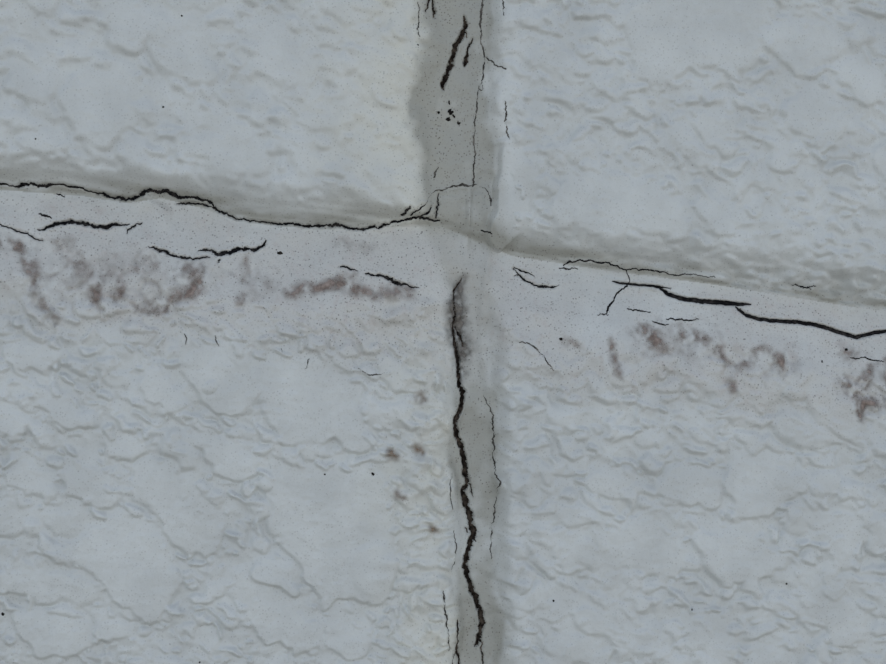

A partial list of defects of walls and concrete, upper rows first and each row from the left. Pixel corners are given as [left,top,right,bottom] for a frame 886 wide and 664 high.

crack [0,0,507,263]
crack [503,101,511,140]
crack [328,266,419,288]
crack [513,259,886,362]
crack [443,278,502,664]